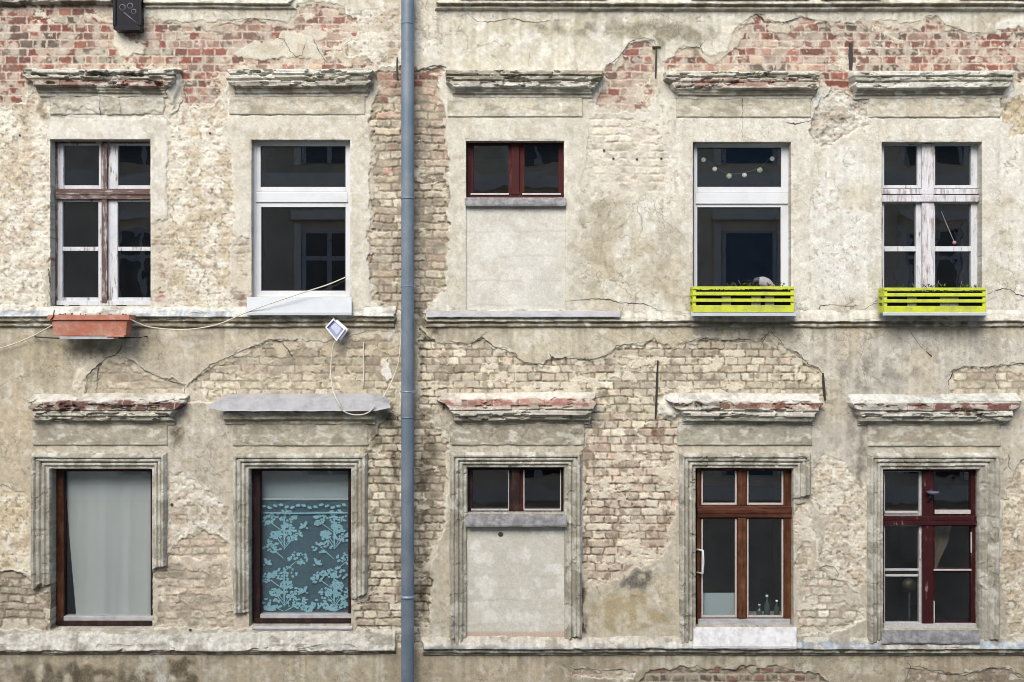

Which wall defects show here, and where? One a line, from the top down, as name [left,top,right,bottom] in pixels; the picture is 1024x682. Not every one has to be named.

flaking render [0,1,401,313]
flaking render [587,14,1024,199]
crack [85,338,295,394]
flaking render [86,330,401,648]
flaking render [414,67,828,648]
flaking render [560,663,829,682]